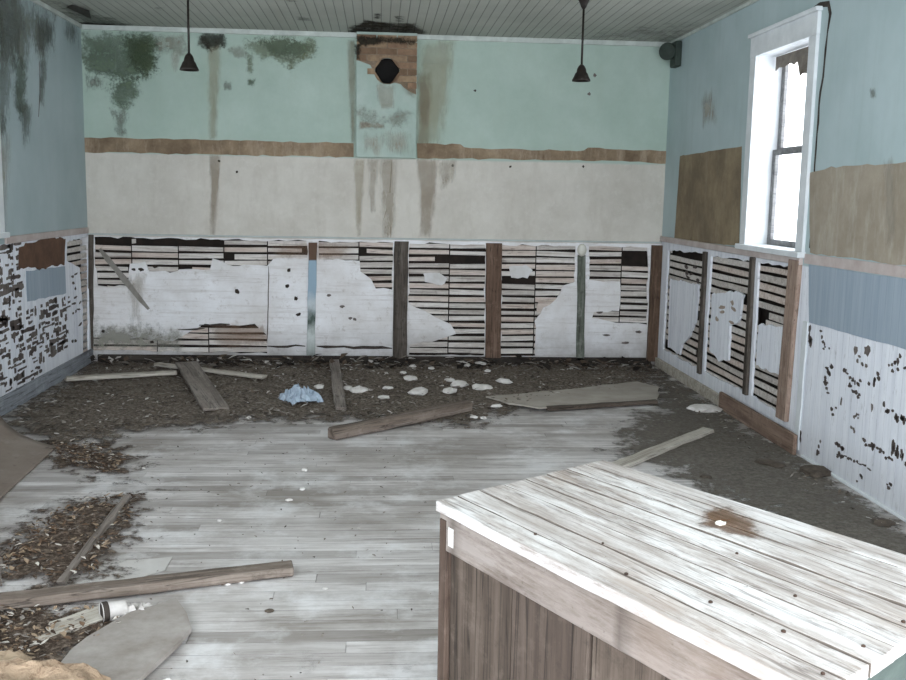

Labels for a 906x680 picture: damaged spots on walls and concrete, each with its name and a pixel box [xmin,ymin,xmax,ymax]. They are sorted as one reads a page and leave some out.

damp [0,0,52,125]
damp [62,8,181,134]
damp [198,33,225,52]
damp [248,37,315,85]
flaking render [417,143,666,168]
spalling [0,237,308,392]
spalling [319,241,393,289]
spalling [408,242,486,356]
spalling [501,244,575,357]
spalling [589,246,648,333]
flaking render [665,146,749,389]
spalling [753,263,788,409]